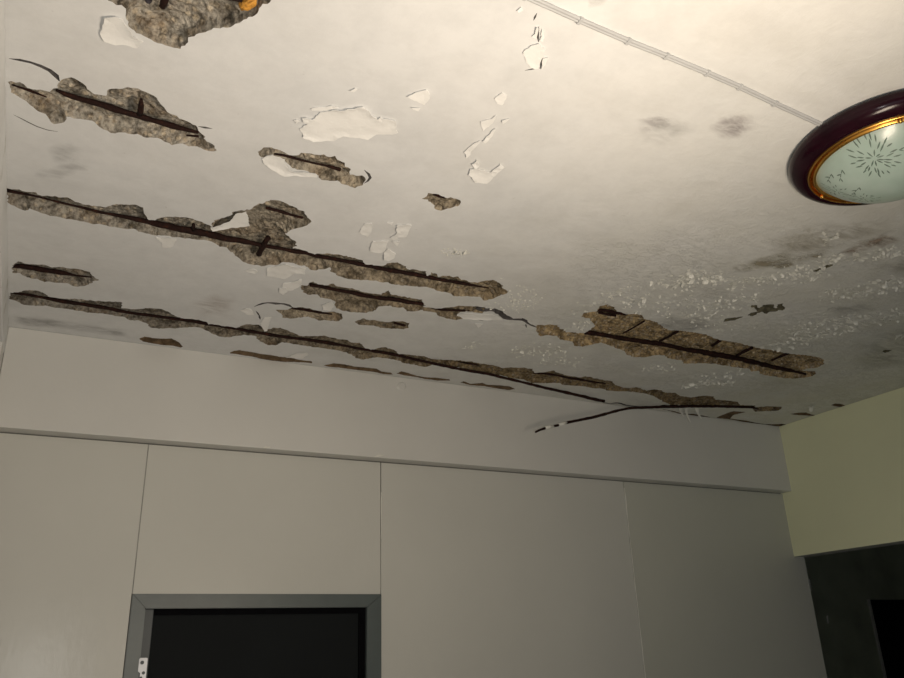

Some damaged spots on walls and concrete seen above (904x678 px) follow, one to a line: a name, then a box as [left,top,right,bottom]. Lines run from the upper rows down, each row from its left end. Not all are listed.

spalling [100,0,271,49]
peeling [523,28,548,69]
spalling [8,77,216,151]
peeling [294,105,398,142]
spalling [258,147,366,188]
peeling [464,115,509,184]
spalling [7,188,904,426]